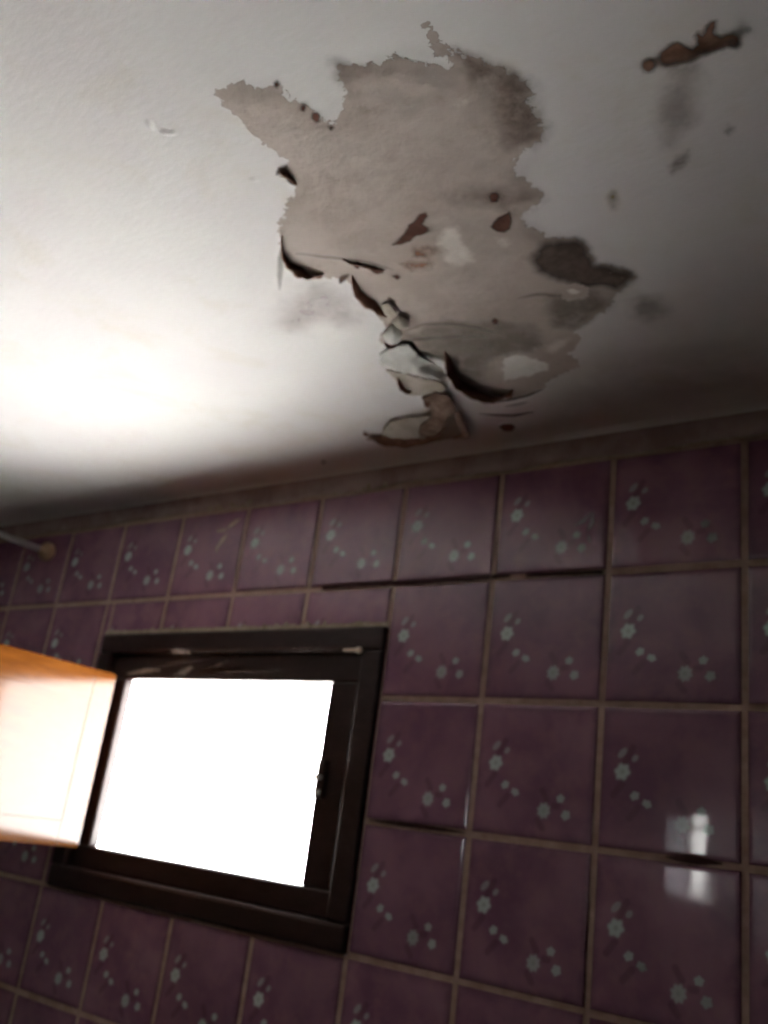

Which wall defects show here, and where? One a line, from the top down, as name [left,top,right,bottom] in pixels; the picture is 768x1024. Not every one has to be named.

spalling [642,21,740,73]
spalling [214,21,637,449]
crack [322,570,603,590]